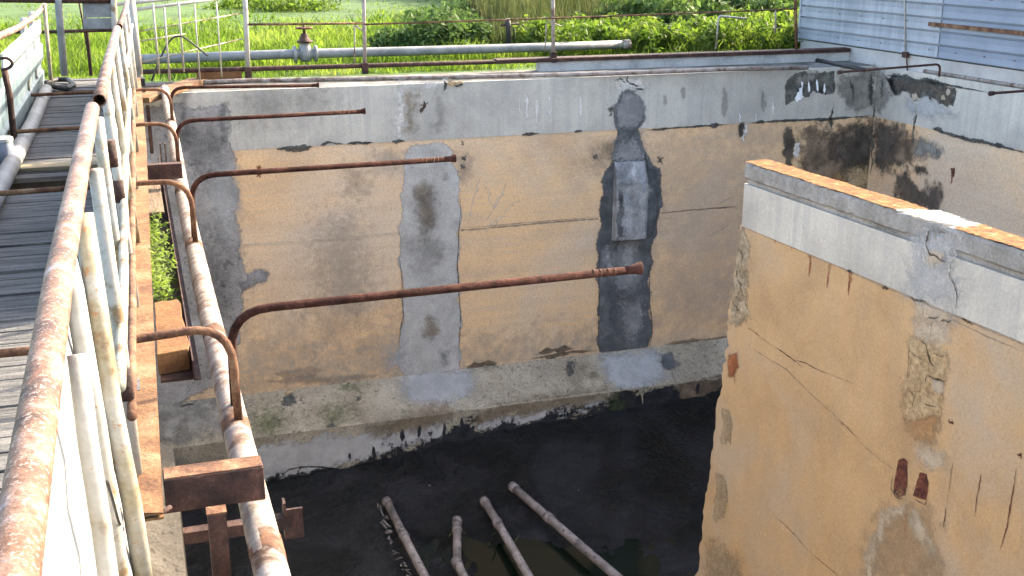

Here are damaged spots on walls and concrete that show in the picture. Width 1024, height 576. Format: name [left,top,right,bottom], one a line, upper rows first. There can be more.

spalling [785,71,835,105]
peeling [887,73,958,107]
damp [753,71,1023,226]
peeling [729,227,751,326]
crack [663,197,1024,351]
damp [257,375,722,481]
rust [728,353,738,383]
crack [750,329,891,468]
spalling [901,297,955,442]